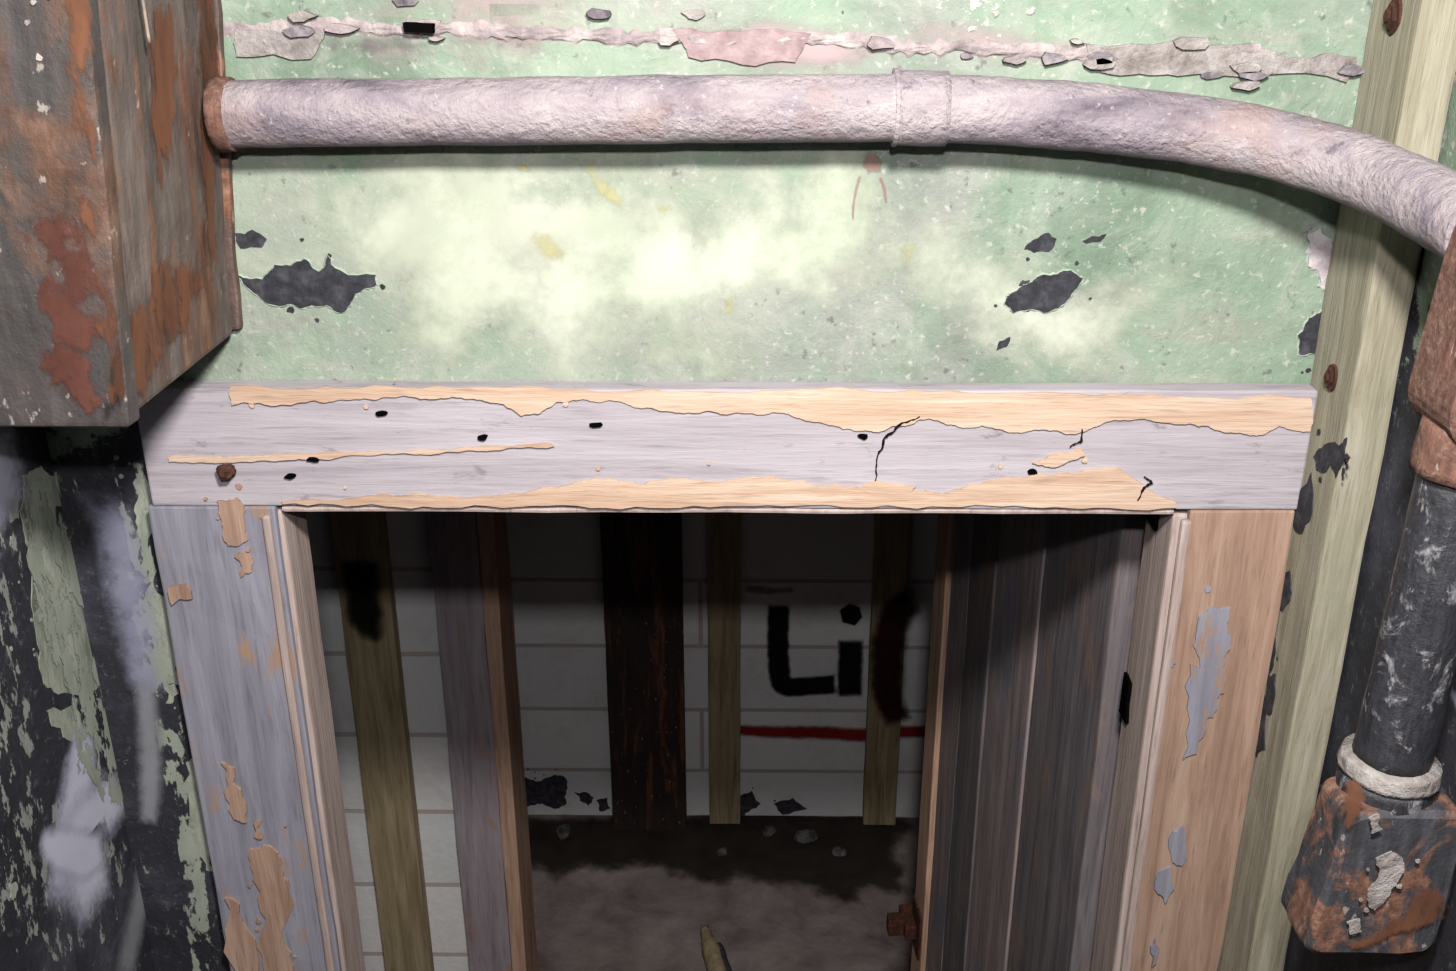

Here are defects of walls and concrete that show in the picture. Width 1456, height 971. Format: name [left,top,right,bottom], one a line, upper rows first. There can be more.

spalling [224,0,1365,91]
peeling [235,230,267,249]
peeling [239,238,386,322]
peeling [994,233,1092,314]
peeling [1083,234,1106,243]
peeling [229,377,1351,533]
peeling [1280,570,1292,611]
peeling [0,466,127,962]
corrosion [1344,779,1365,829]
corrosion [1348,889,1444,949]